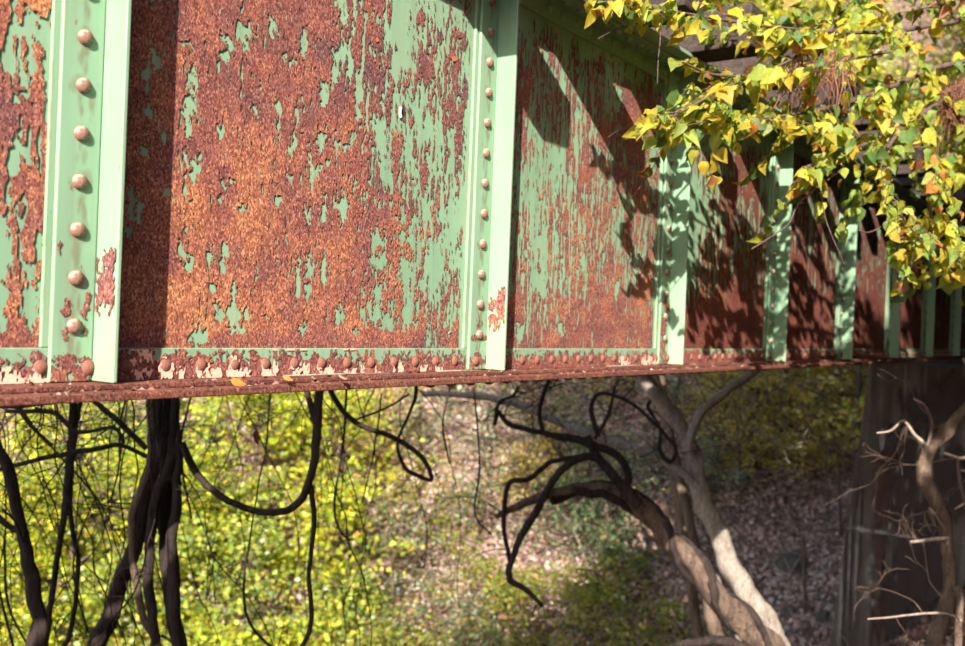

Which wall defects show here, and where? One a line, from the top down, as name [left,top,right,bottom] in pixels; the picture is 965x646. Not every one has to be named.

peeling [0,367,50,384]
rust [0,0,90,383]
peeling [130,349,307,380]
peeling [291,362,381,375]
rust [60,0,670,380]
rust [683,132,770,364]
rust [786,153,841,361]
rust [852,190,888,359]
rust [899,214,924,349]
rust [934,268,965,349]